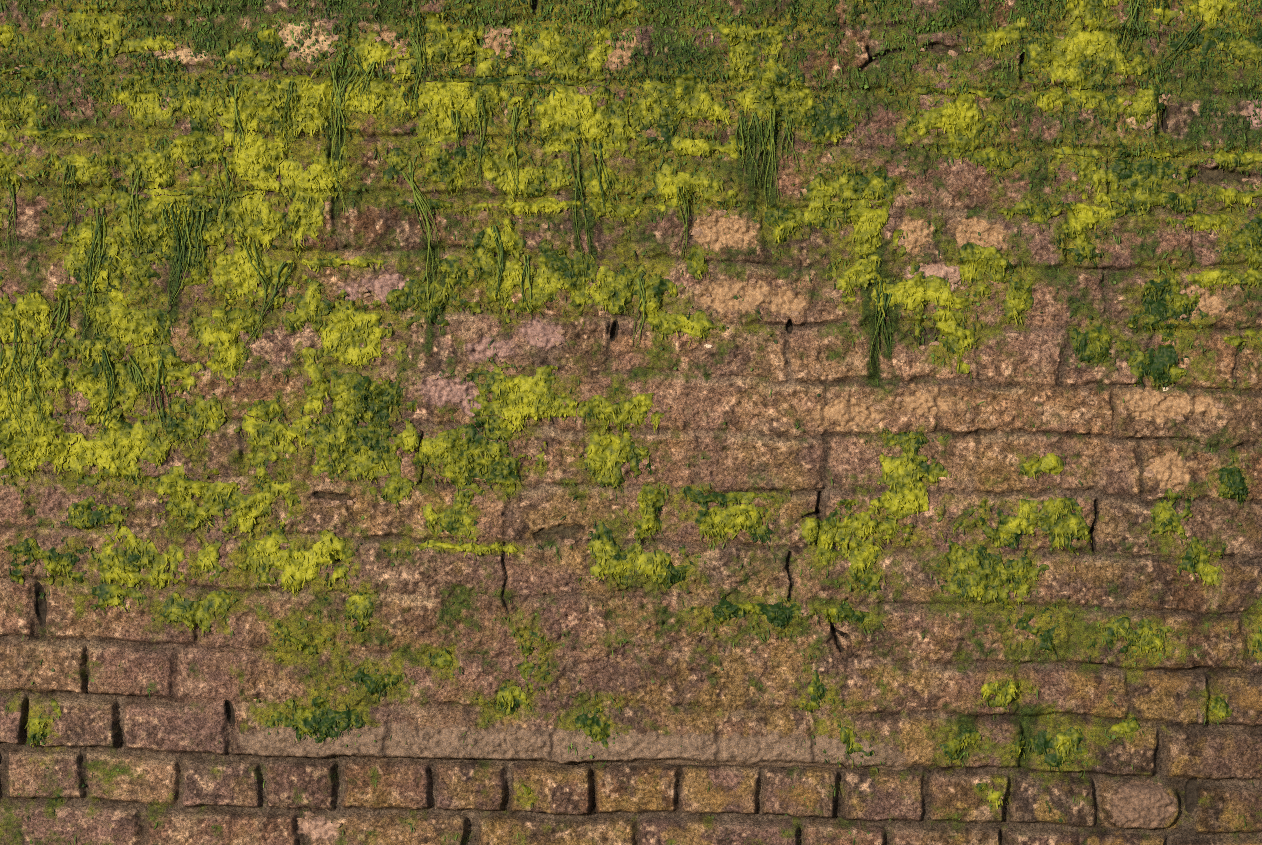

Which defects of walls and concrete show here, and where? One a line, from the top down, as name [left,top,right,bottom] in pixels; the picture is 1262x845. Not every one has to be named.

crack [501,542,509,614]
crack [786,491,822,602]